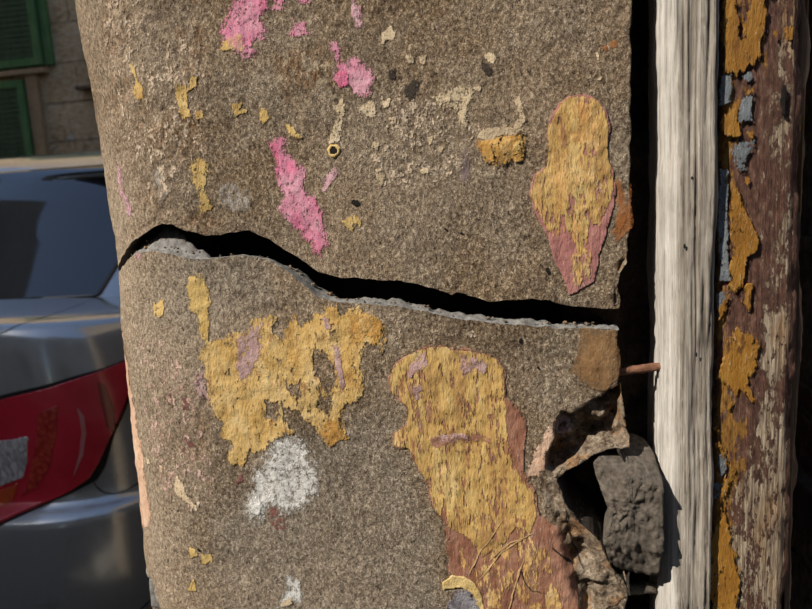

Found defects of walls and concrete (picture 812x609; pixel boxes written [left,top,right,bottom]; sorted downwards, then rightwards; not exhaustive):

crack [118,223,619,330]
peeling [121,273,630,609]